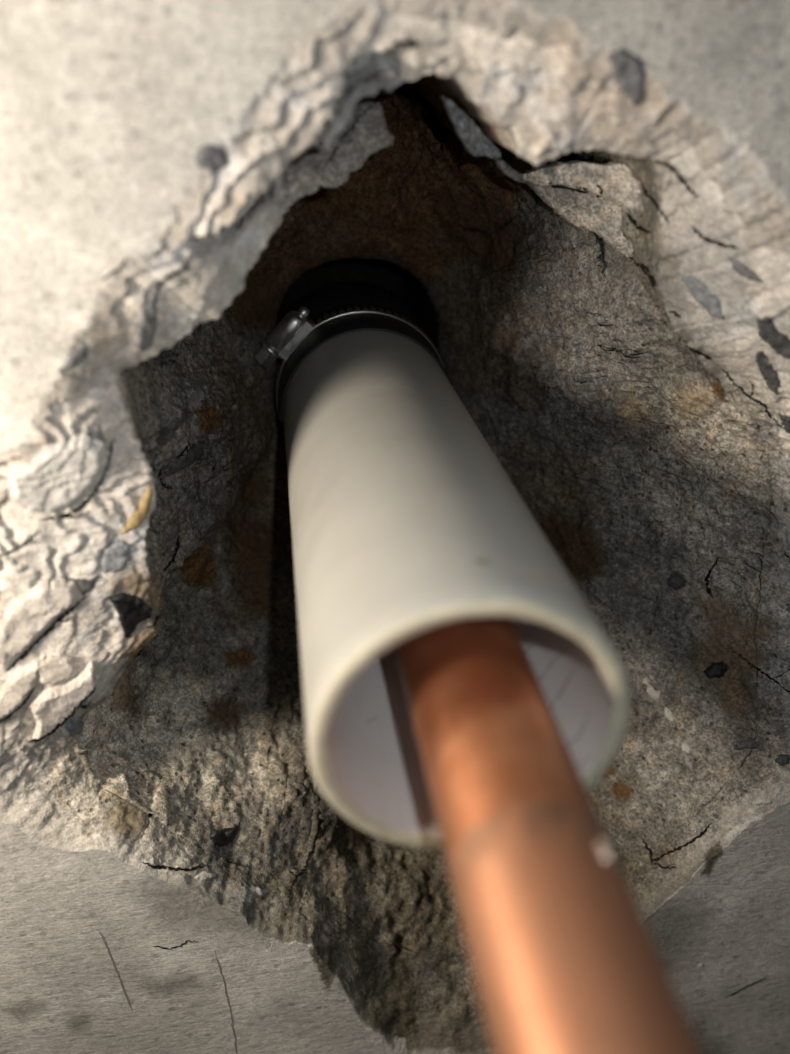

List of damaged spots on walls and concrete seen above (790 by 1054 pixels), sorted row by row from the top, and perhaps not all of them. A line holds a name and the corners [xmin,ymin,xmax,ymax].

spalling [6,433,109,514]
rust [180,542,217,591]
spalling [73,72,772,958]
rust [534,516,607,578]
crack [704,557,719,599]
spalling [0,580,82,670]
rust [697,596,773,711]
spalling [0,655,44,720]
spalling [30,661,98,741]
crack [141,862,204,872]
crack [641,824,710,869]
crack [153,940,192,950]